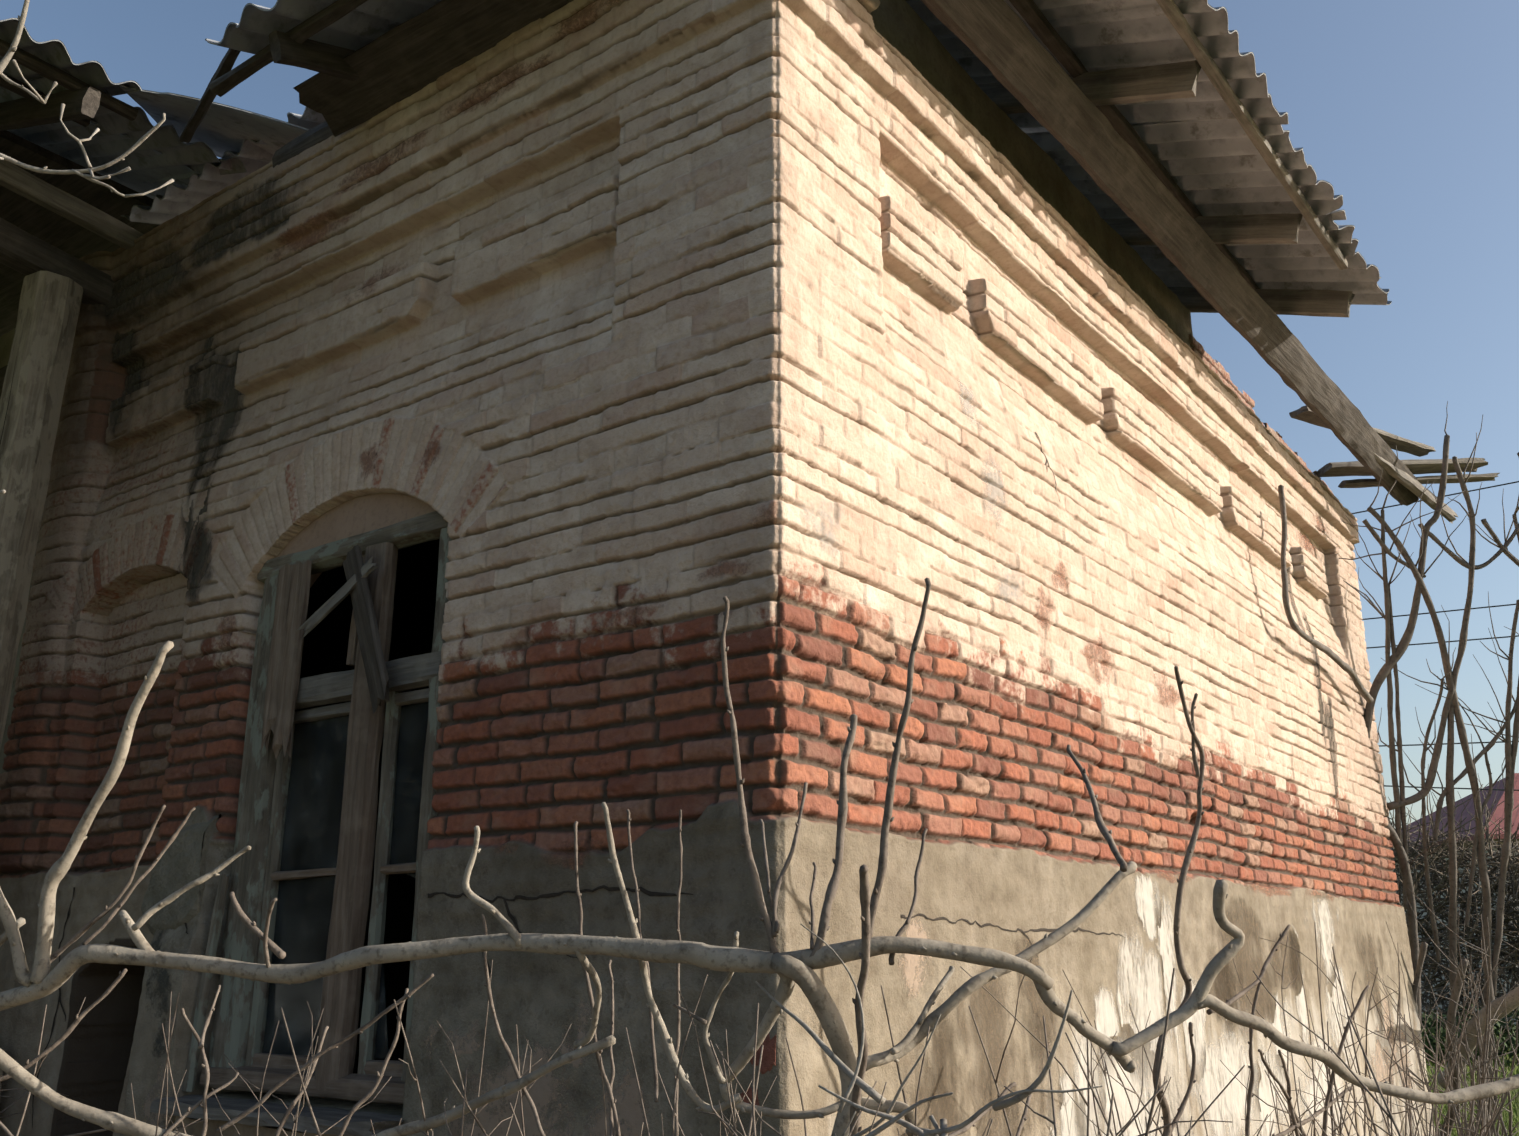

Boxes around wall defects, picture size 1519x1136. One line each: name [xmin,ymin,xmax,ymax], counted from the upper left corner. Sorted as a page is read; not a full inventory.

leakage [96,179,296,432]
leakage [179,337,246,601]
peeling [1035,563,1068,626]
peeling [1085,641,1109,682]
peeling [1158,682,1180,705]
crack [428,885,693,933]
crack [901,913,1128,945]
leakage [1215,900,1300,1035]
leakage [1362,935,1383,1029]